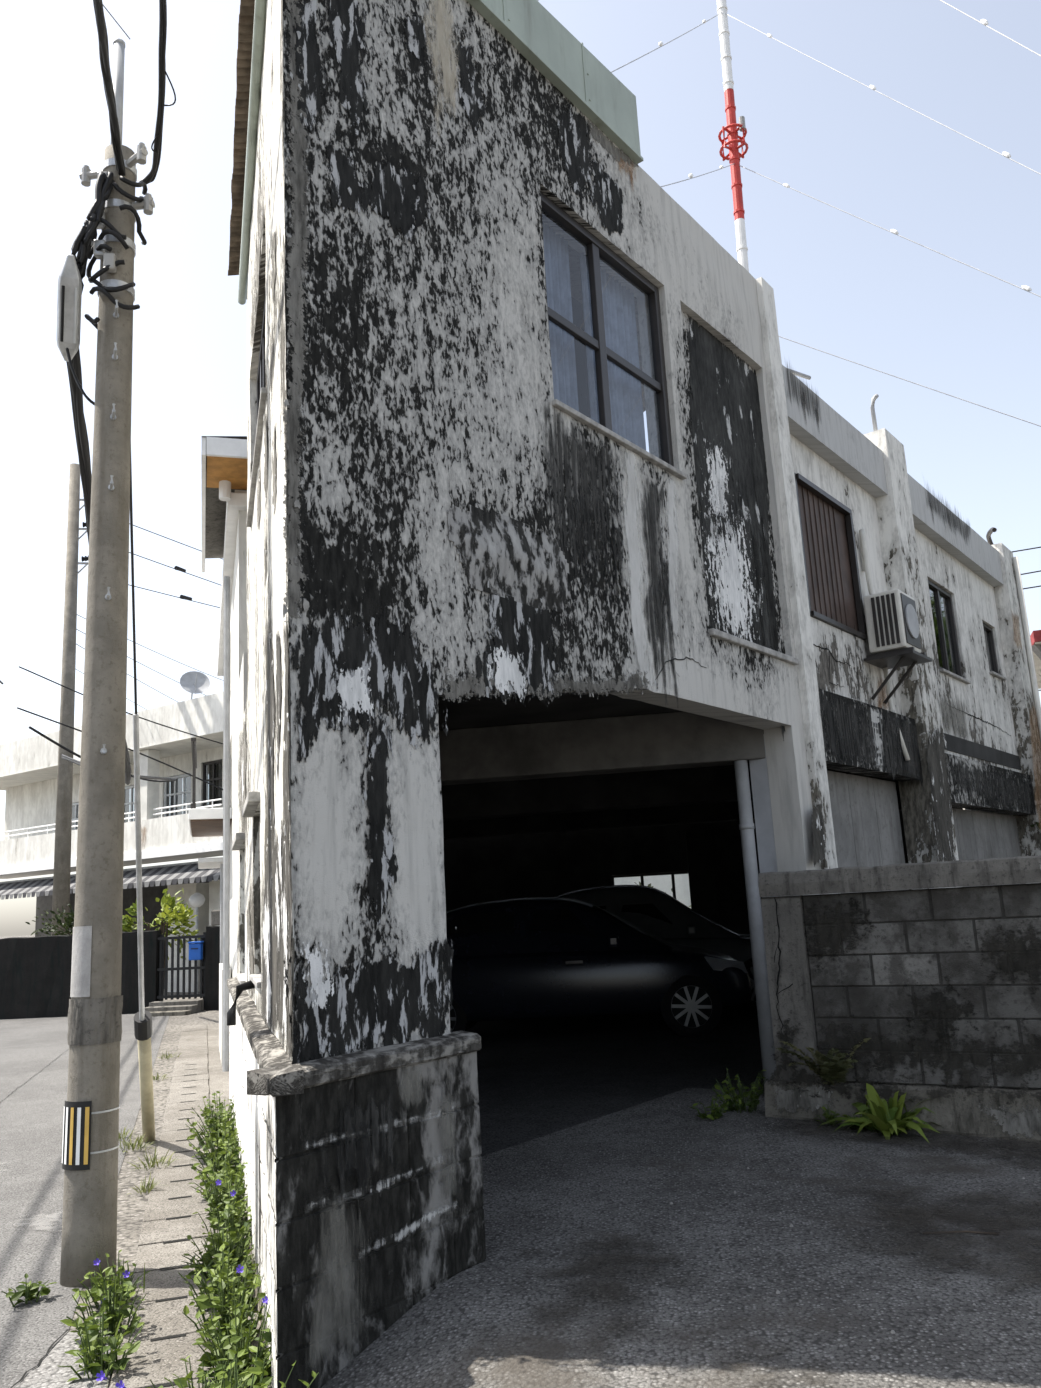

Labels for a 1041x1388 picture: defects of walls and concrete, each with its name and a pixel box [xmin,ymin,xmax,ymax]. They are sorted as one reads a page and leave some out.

leakage [425,0,457,120]
leakage [686,316,780,651]
leakage [537,408,679,704]
leakage [819,686,923,784]
leakage [937,695,968,739]
leakage [948,760,1036,816]
leakage [802,895,880,971]
leakage [969,919,1041,994]
leakage [904,975,977,1042]
leakage [307,1070,457,1365]